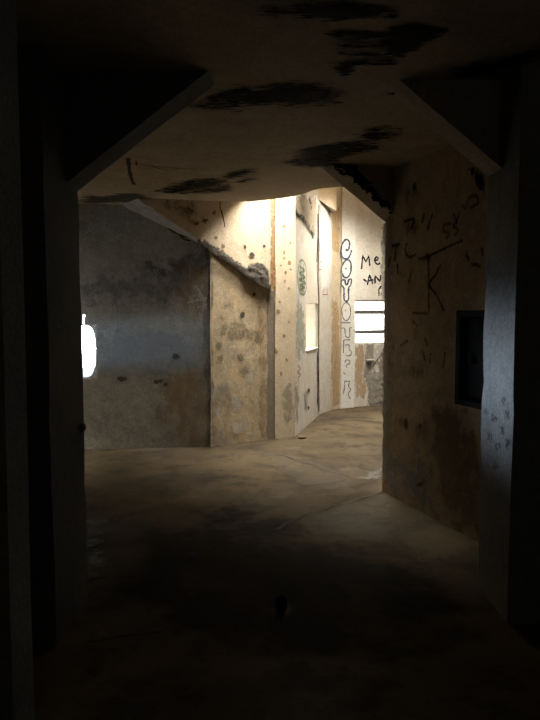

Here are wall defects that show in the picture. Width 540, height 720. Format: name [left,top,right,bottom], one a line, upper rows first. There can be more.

spalling [197,239,271,296]